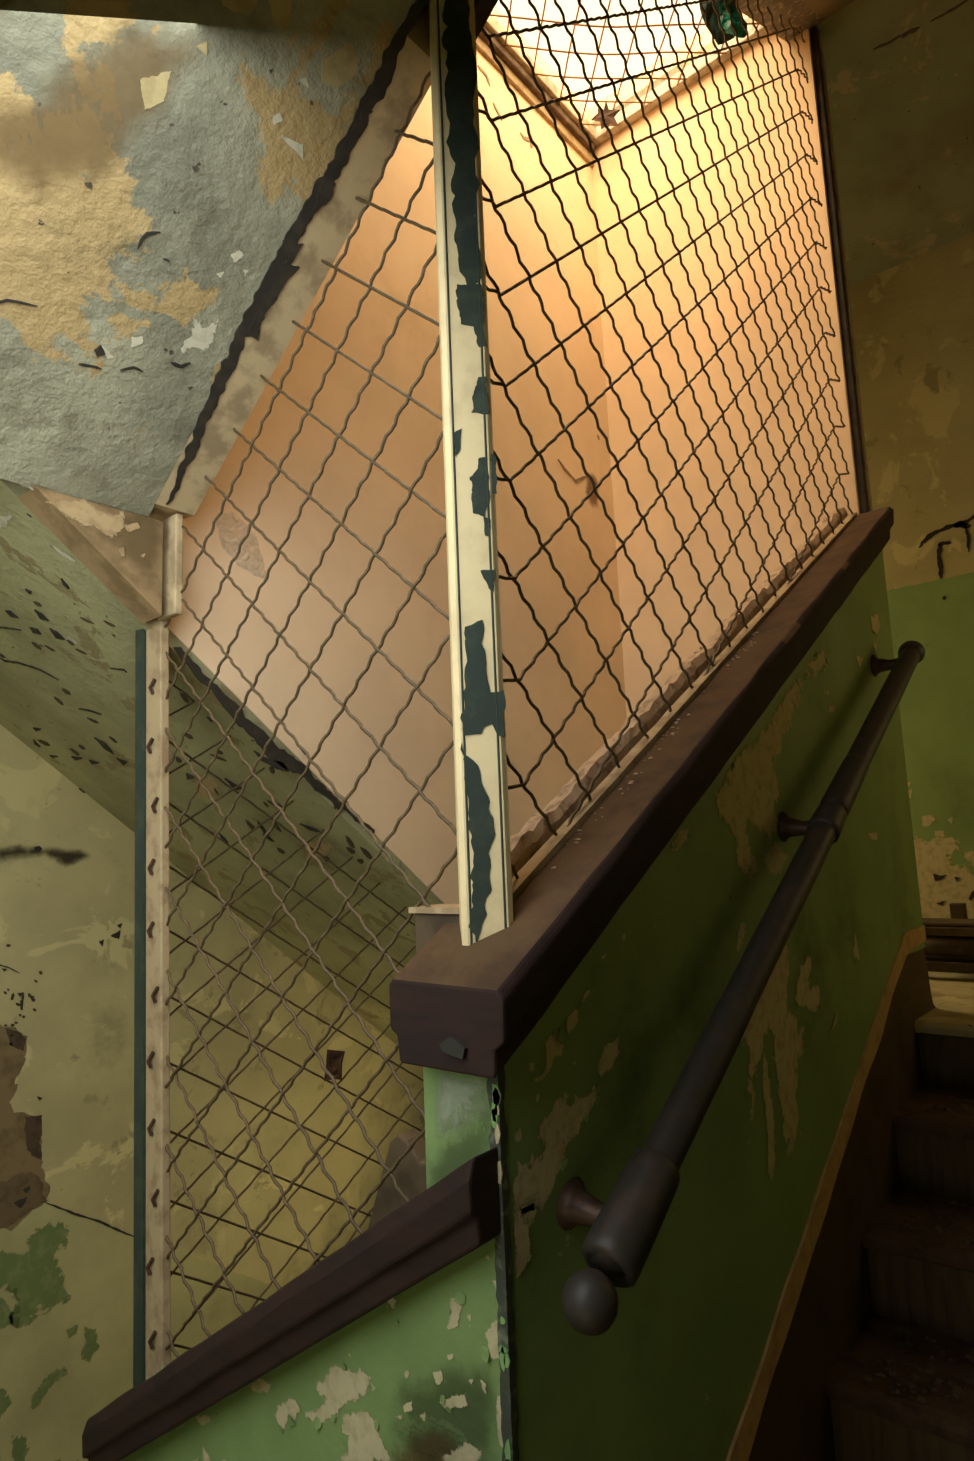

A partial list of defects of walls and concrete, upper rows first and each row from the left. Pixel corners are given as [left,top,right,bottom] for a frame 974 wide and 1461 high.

peeling [914,814,974,919]
spalling [0,968,51,1231]
peeling [512,990,620,1278]
peeling [740,941,838,1181]
peeling [250,1352,503,1461]
peeling [446,1290,499,1363]